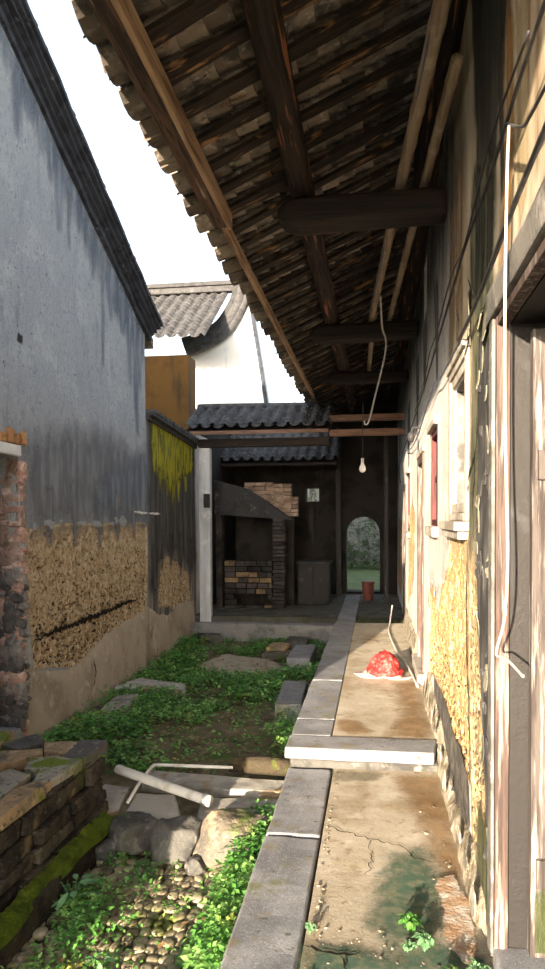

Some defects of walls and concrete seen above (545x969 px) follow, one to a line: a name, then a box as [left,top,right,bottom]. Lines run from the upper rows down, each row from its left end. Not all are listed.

leakage [4,41,196,597]
flaking render [26,515,192,670]
crack [328,826,448,874]
flaking render [398,502,415,603]
flaking render [427,279,489,859]
leakage [408,0,545,552]